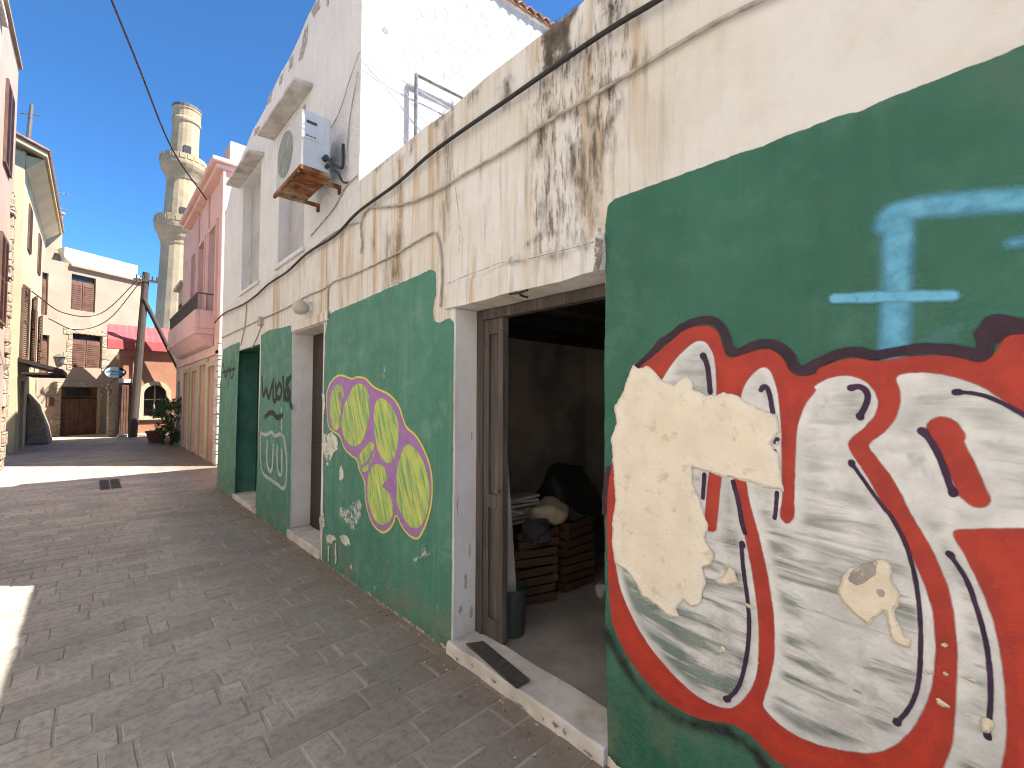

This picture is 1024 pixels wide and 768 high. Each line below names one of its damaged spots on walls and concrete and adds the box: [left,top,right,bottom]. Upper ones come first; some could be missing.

water stain [536,6,615,234]
peeling [321,432,344,480]
peeling [611,365,784,618]
peeling [838,560,912,648]